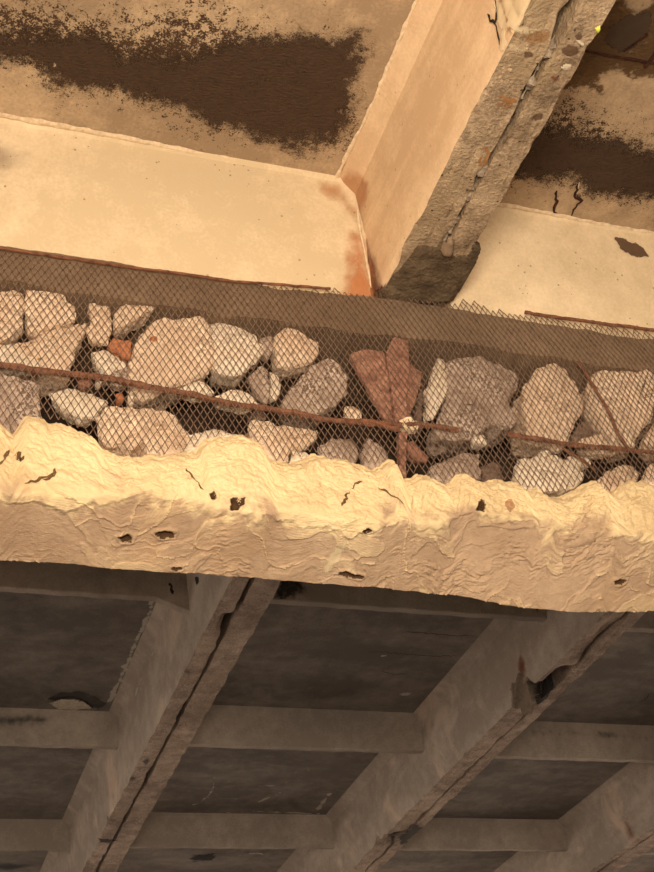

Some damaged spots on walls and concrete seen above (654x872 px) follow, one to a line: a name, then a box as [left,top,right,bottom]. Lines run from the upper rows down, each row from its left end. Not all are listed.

damp [0,112,203,154]
rust [347,253,381,297]
spalling [107,338,131,363]
spalling [48,692,106,710]
spalling [510,673,554,715]